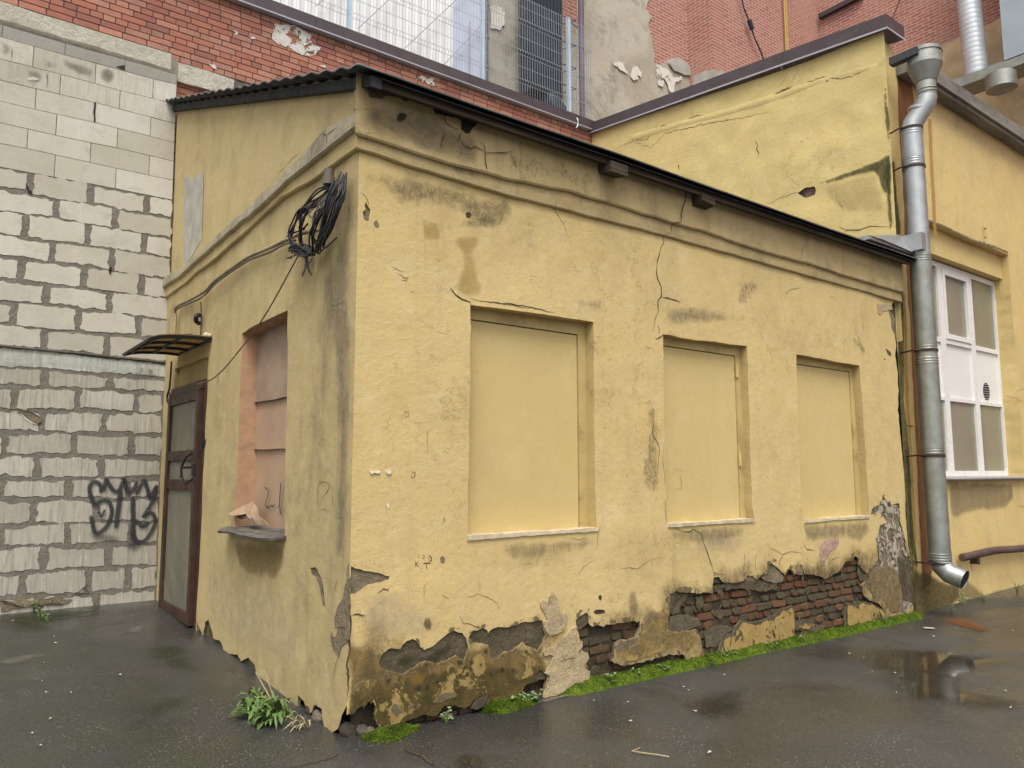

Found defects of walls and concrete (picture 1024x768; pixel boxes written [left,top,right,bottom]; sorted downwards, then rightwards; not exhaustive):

peeling [272,23,326,68]
flaking render [614,61,642,81]
flaking render [656,64,682,92]
crack [776,63,882,94]
crack [441,111,517,176]
flaking render [799,187,816,198]
crack [653,192,709,339]
crack [451,289,548,312]
crack [678,529,869,577]
flaking render [576,495,913,676]
flaking render [312,563,389,682]
flaking render [340,616,548,729]